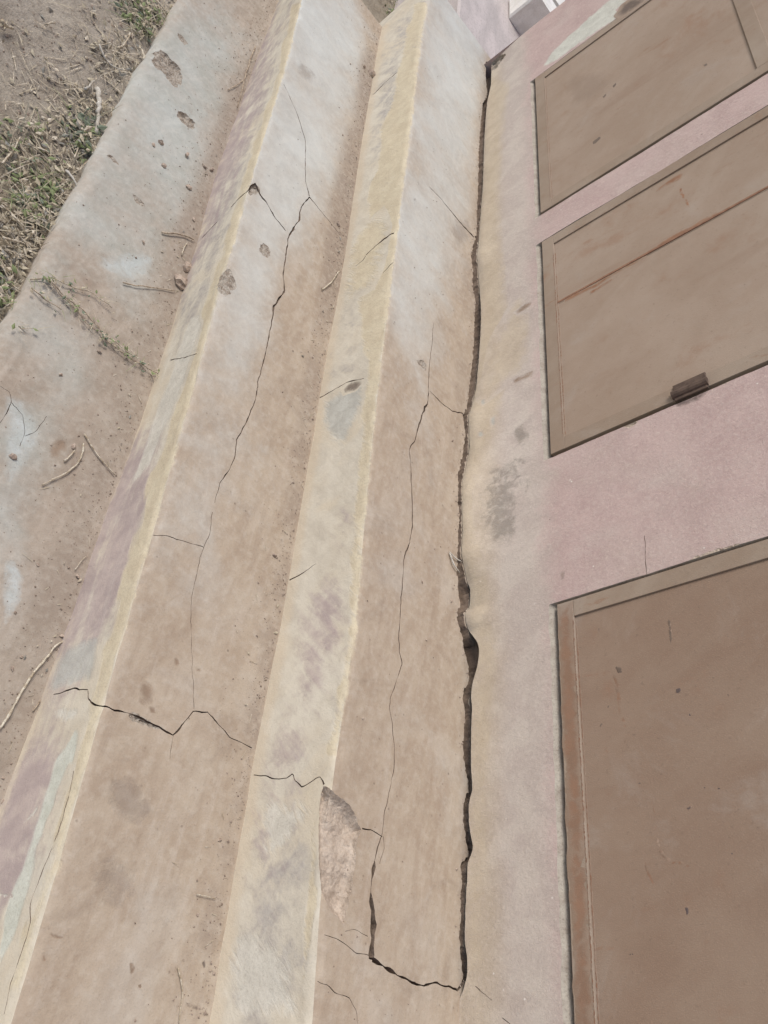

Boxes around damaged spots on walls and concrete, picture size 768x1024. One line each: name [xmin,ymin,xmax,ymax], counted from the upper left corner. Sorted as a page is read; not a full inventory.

crack [53,85,338,753]
crack [254,774,325,788]
spalling [319,786,361,925]
crack [326,76,510,1024]